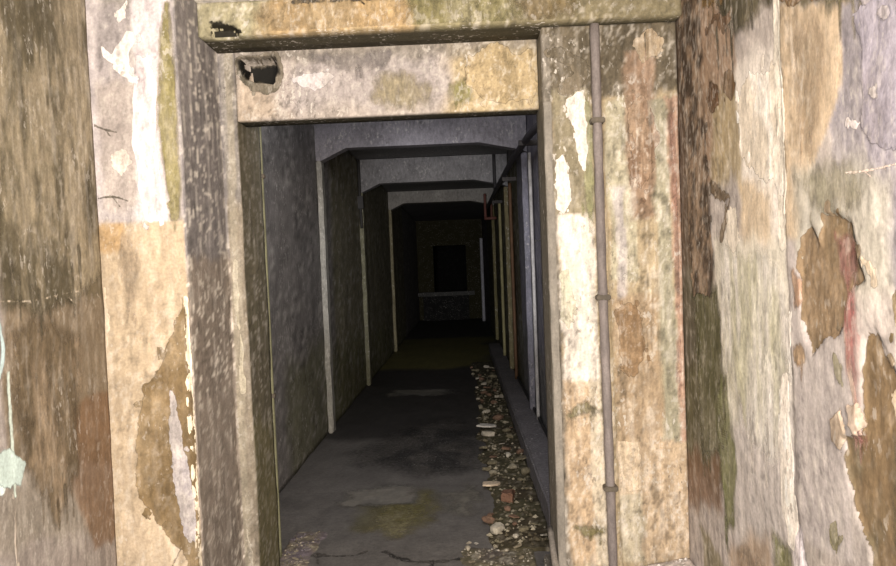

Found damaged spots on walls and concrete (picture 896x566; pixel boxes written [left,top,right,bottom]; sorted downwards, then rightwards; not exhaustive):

spalling [235,51,334,96]
spalling [633,28,664,63]
spalling [678,0,800,298]
spalling [133,296,202,566]
crack [311,551,460,566]
leakage [694,247,786,547]
spalling [777,199,896,566]